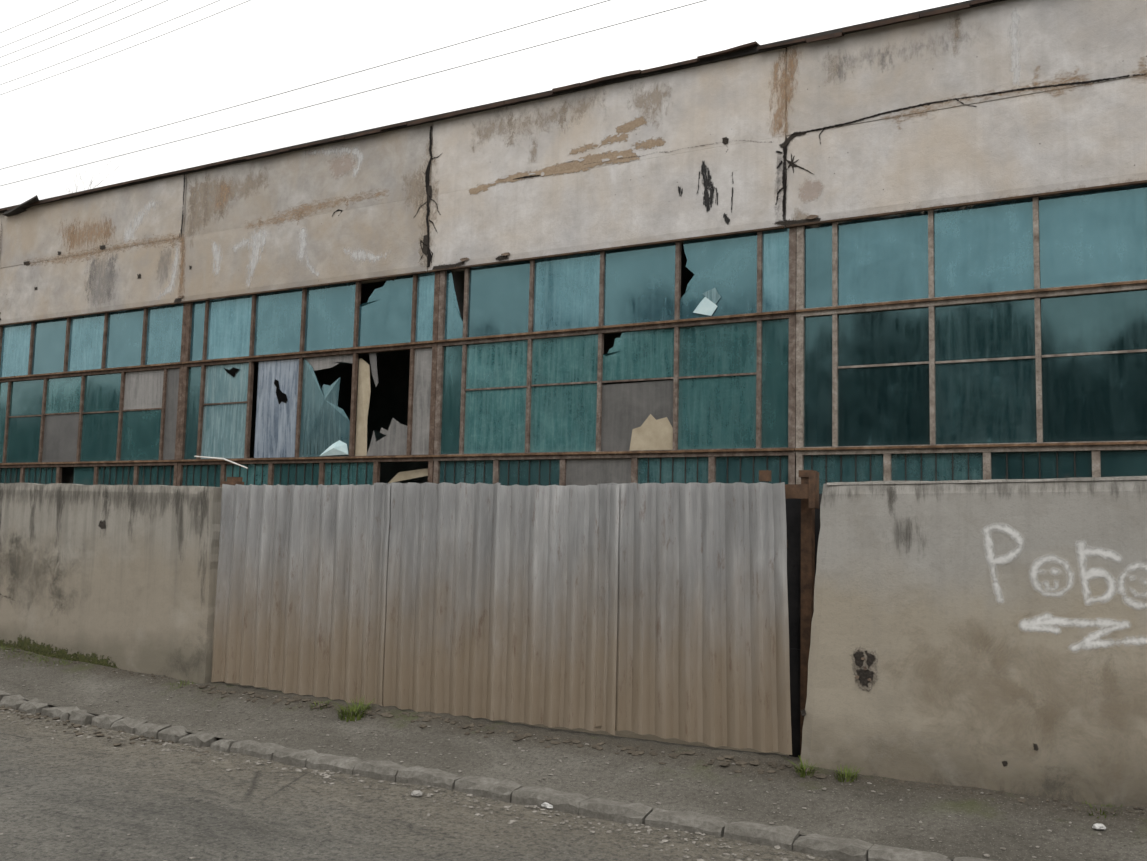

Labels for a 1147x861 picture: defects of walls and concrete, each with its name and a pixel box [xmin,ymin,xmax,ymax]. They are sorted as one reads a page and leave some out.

peeling [469,116,665,195]
crack [622,74,1146,220]
crack [414,126,441,267]
damp [0,488,205,539]
spalling [851,647,878,692]